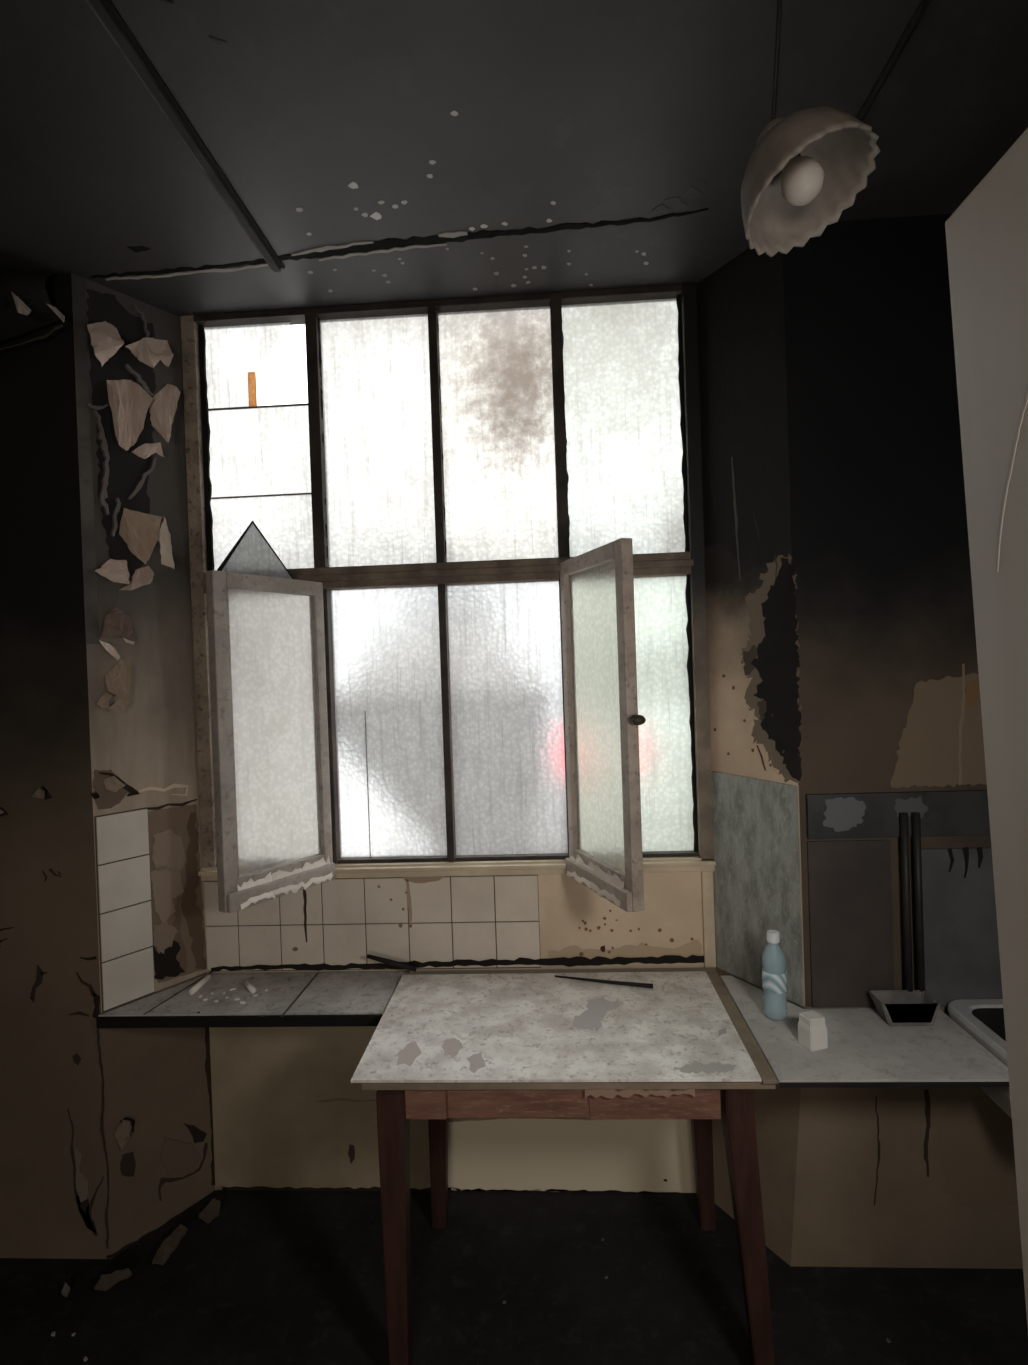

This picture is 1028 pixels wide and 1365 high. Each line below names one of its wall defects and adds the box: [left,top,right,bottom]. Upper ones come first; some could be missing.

peeling [291,231,468,261]
crack [91,208,709,279]
peeling [11,292,31,315]
flaking render [86,263,269,590]
flaking render [92,769,207,983]
crack [30,956,135,1249]
crack [158,1143,208,1201]